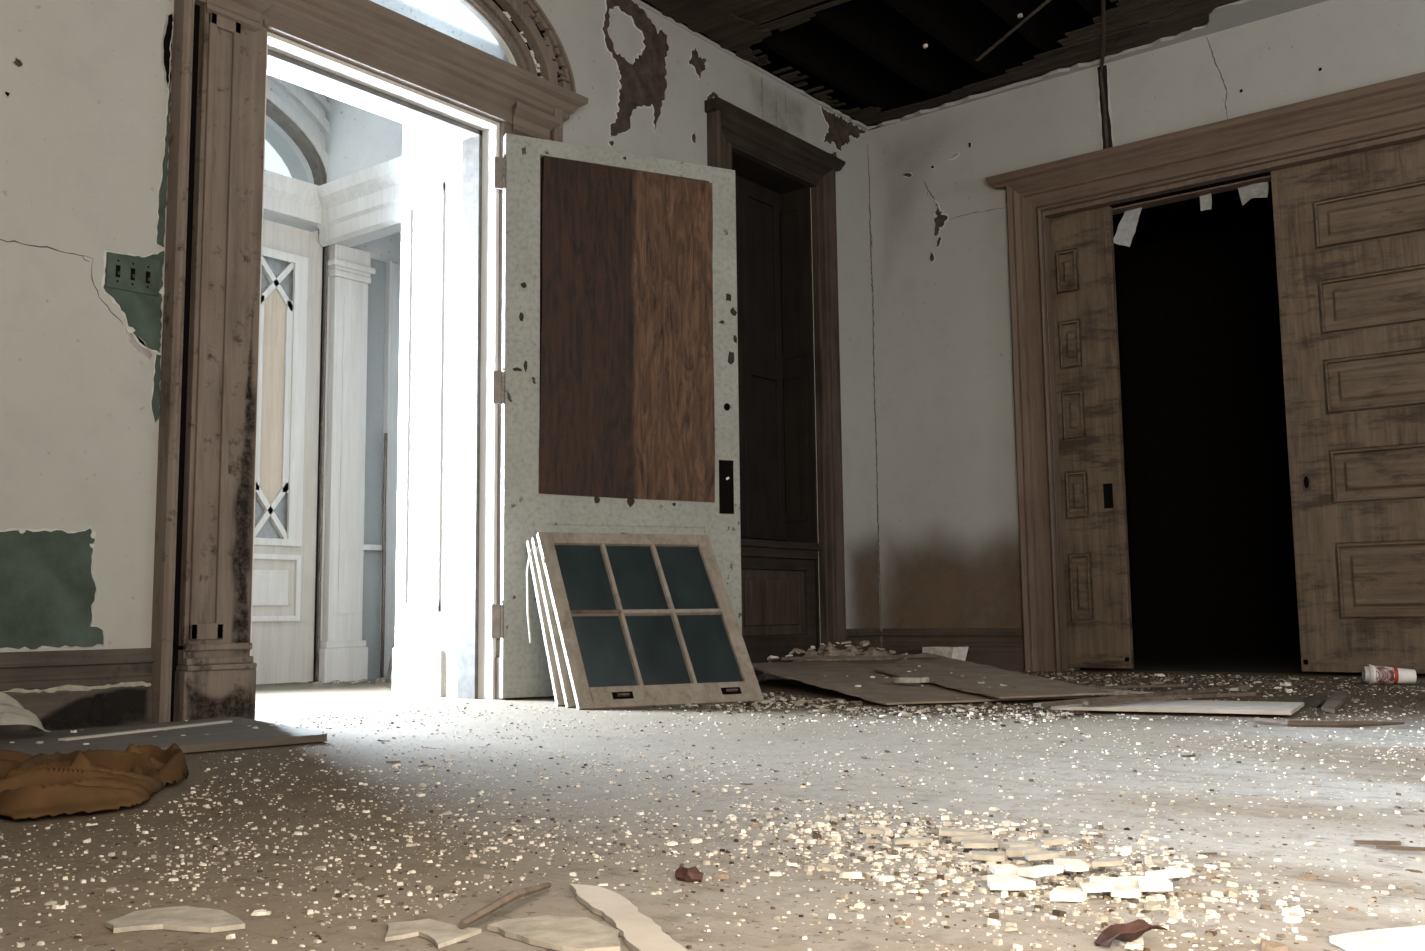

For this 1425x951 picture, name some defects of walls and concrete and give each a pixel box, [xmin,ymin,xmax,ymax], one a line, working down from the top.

spalling [601,0,1241,160]
crack [0,239,123,324]
peeling [101,13,174,424]
peeling [0,526,105,652]